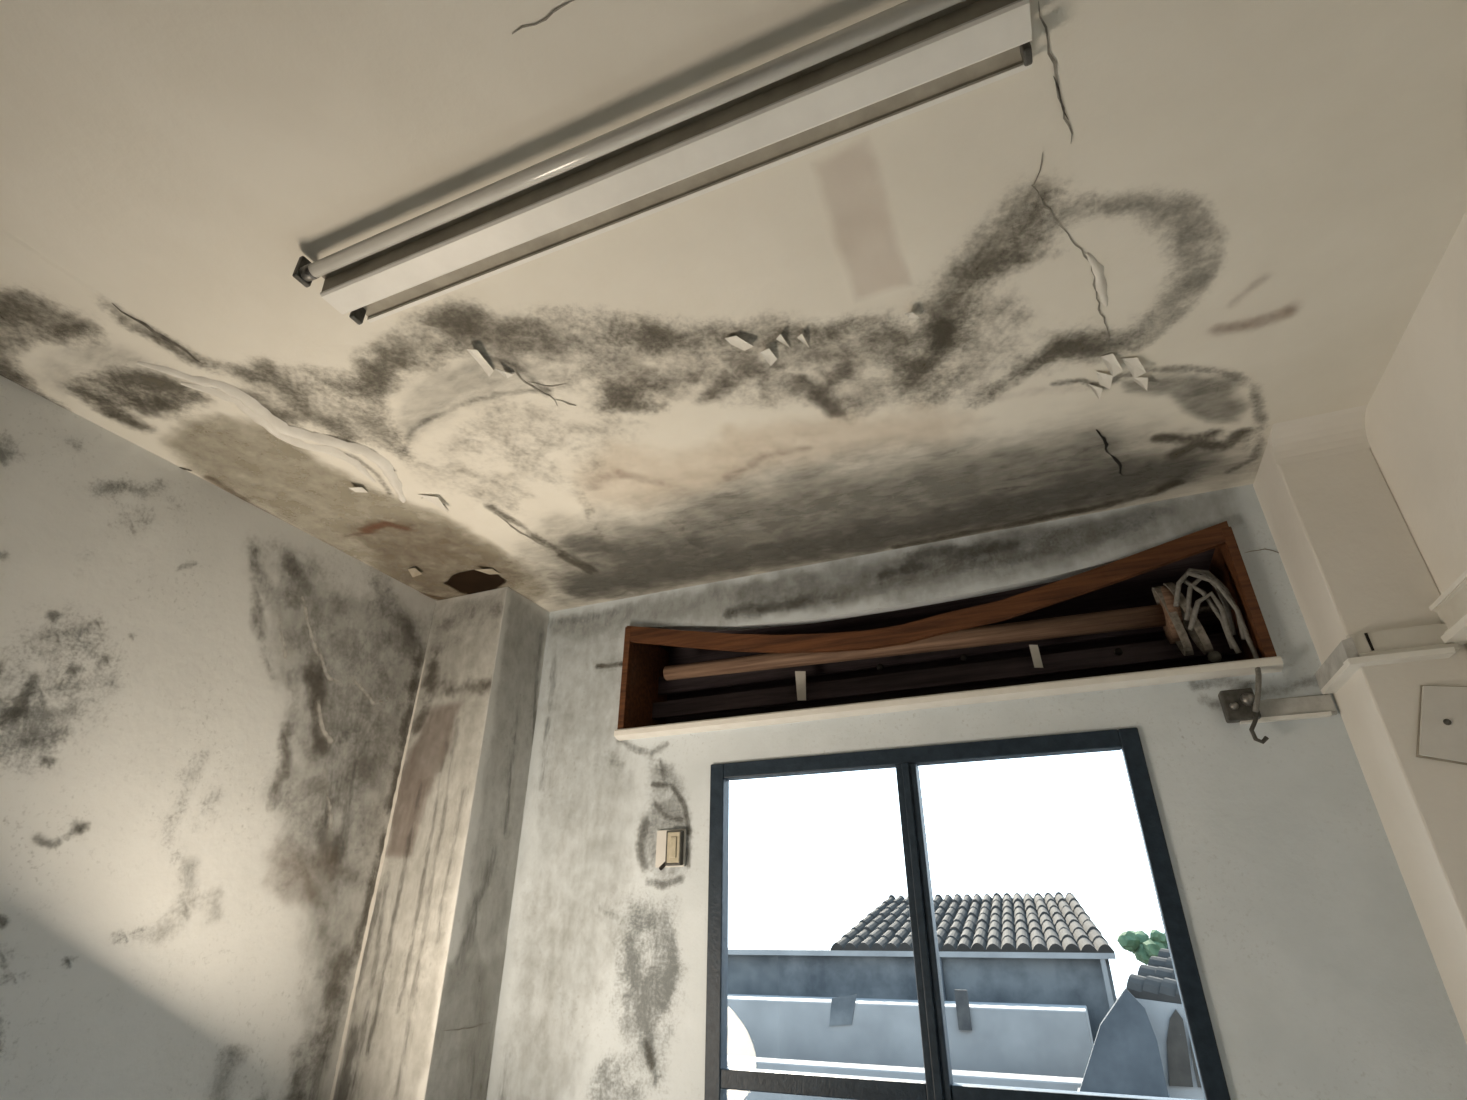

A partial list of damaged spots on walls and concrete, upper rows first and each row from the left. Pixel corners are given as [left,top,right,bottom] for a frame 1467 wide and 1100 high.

crack [512,0,574,34]
crack [1031,1,1110,348]
damp [869,185,1050,387]
damp [0,292,90,386]
damp [68,371,204,430]
peeling [137,361,448,513]
damp [356,306,558,396]
damp [176,364,1262,601]
damp [1015,332,1136,376]
crack [1096,429,1124,476]
flaking render [422,569,506,599]
damp [326,836,385,1006]